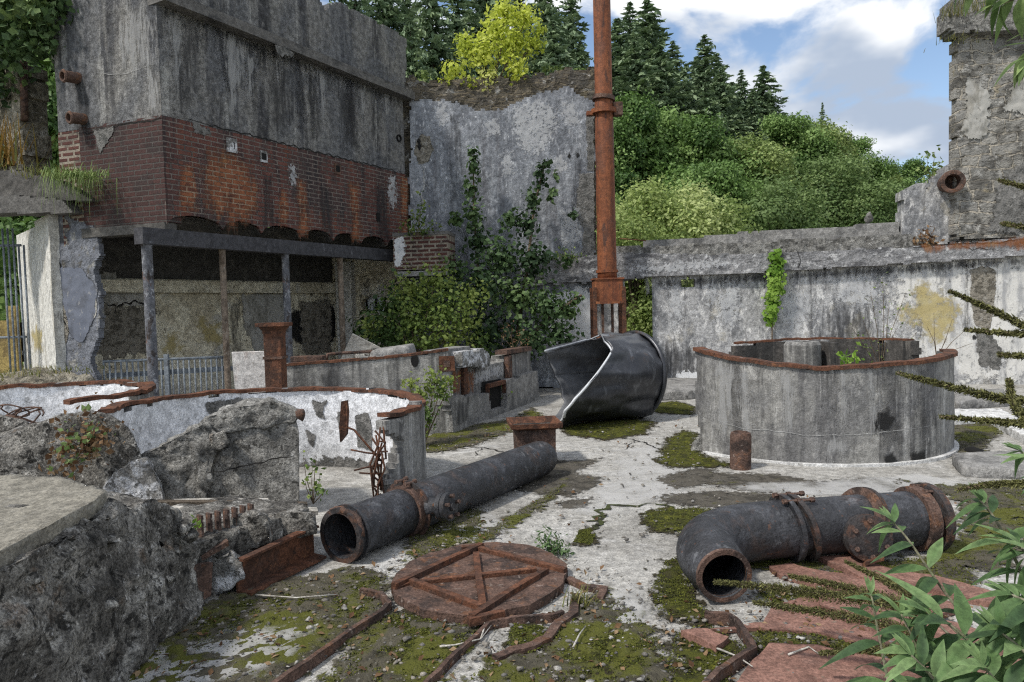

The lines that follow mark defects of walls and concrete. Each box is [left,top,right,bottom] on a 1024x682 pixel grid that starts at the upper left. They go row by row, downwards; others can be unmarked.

water stain [119,9,158,110]
water stain [220,30,325,129]
flaking render [959,77,1024,139]
corrosion [181,150,257,225]
flaking render [986,162,1024,235]
spalling [60,267,157,360]
water stain [626,257,740,301]
water stain [810,262,987,343]
peeling [205,397,243,414]
peeling [312,400,340,427]
spalling [355,413,372,450]
water stain [871,406,895,435]